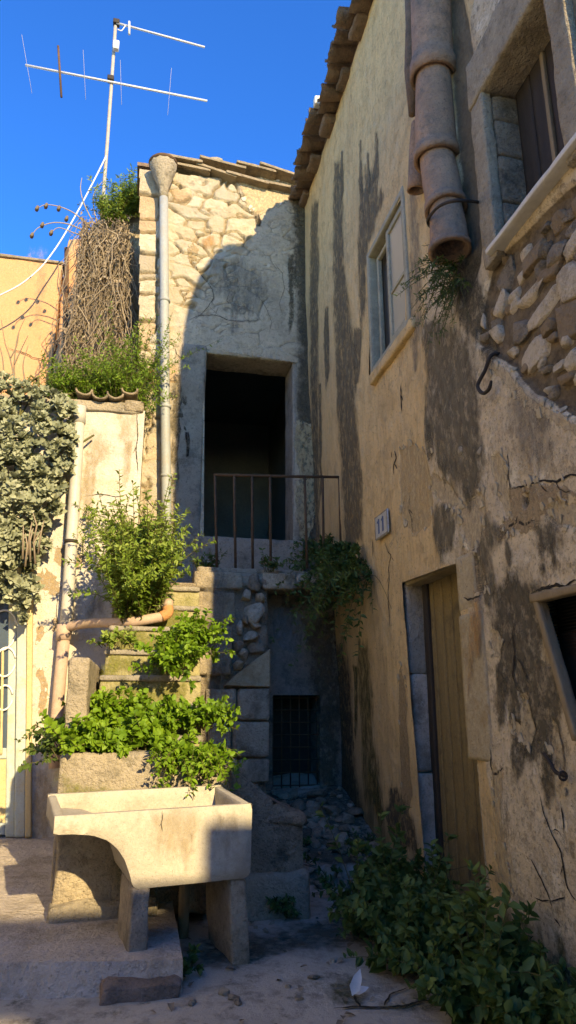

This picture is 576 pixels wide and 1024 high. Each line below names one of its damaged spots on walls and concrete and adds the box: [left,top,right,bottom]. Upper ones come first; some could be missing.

spalling [236,177,293,226]
crack [194,267,288,332]
damp [288,134,384,551]
damp [410,197,498,511]
crack [507,454,576,493]
damp [433,505,455,561]
flaking render [36,664,50,714]
flaking render [35,616,60,645]
damp [473,516,563,806]
crack [531,797,576,926]